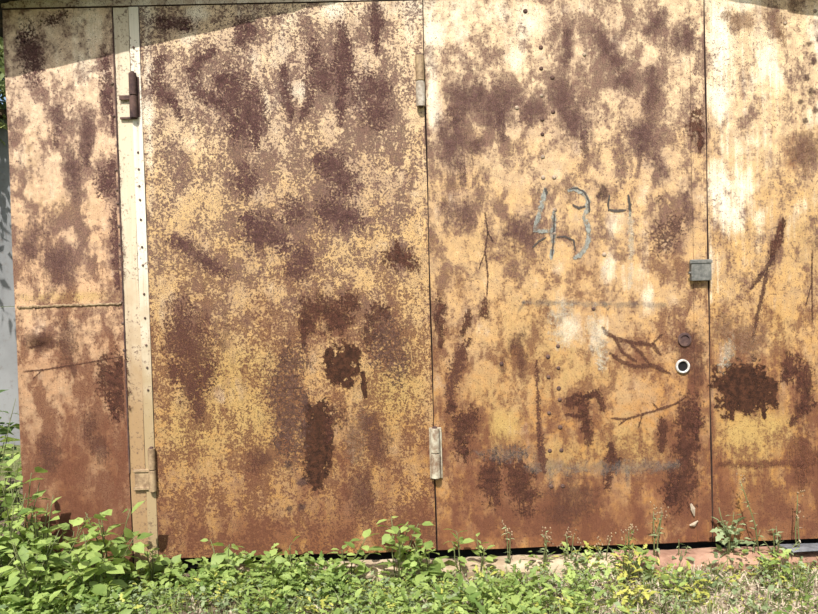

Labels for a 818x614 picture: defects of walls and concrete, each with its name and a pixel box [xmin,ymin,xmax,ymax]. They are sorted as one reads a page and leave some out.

corrosion [15,8,68,88]
corrosion [66,52,126,290]
corrosion [93,346,131,423]
corrosion [161,289,230,423]
corrosion [146,0,395,282]
corrosion [295,289,391,352]
corrosion [380,239,422,273]
corrosion [431,291,447,348]
corrosion [443,297,622,526]
corrosion [645,191,694,257]
corrosion [656,328,707,516]
corrosion [778,351,818,490]